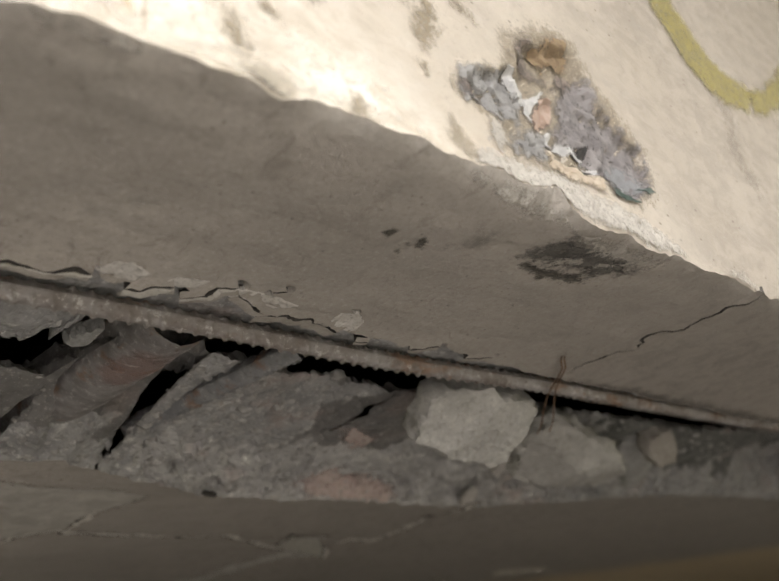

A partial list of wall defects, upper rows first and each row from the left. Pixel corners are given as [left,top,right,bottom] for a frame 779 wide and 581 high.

peeling [500,64,543,121]
crack [565,286,769,372]
spalling [0,269,779,508]
crack [267,501,480,559]